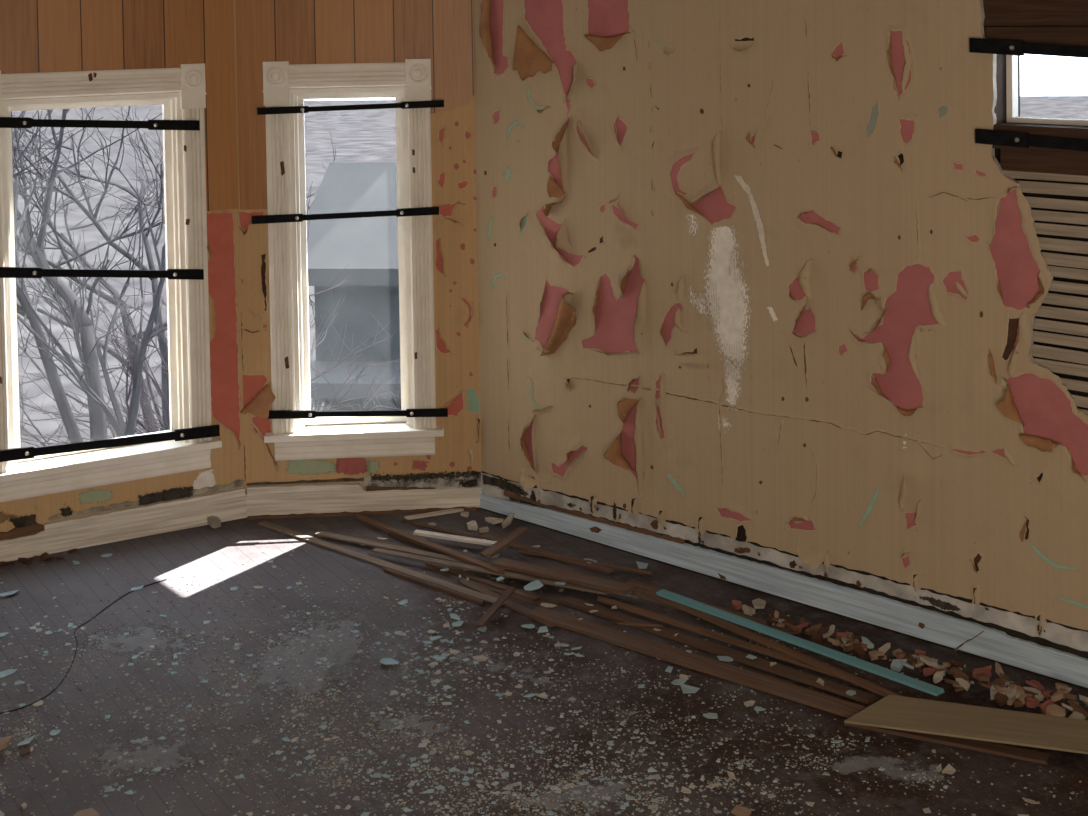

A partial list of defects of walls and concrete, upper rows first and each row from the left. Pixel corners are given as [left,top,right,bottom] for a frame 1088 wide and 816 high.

water stain [686,213,752,434]
spalling [0,501,139,541]
flaking render [192,461,1088,659]